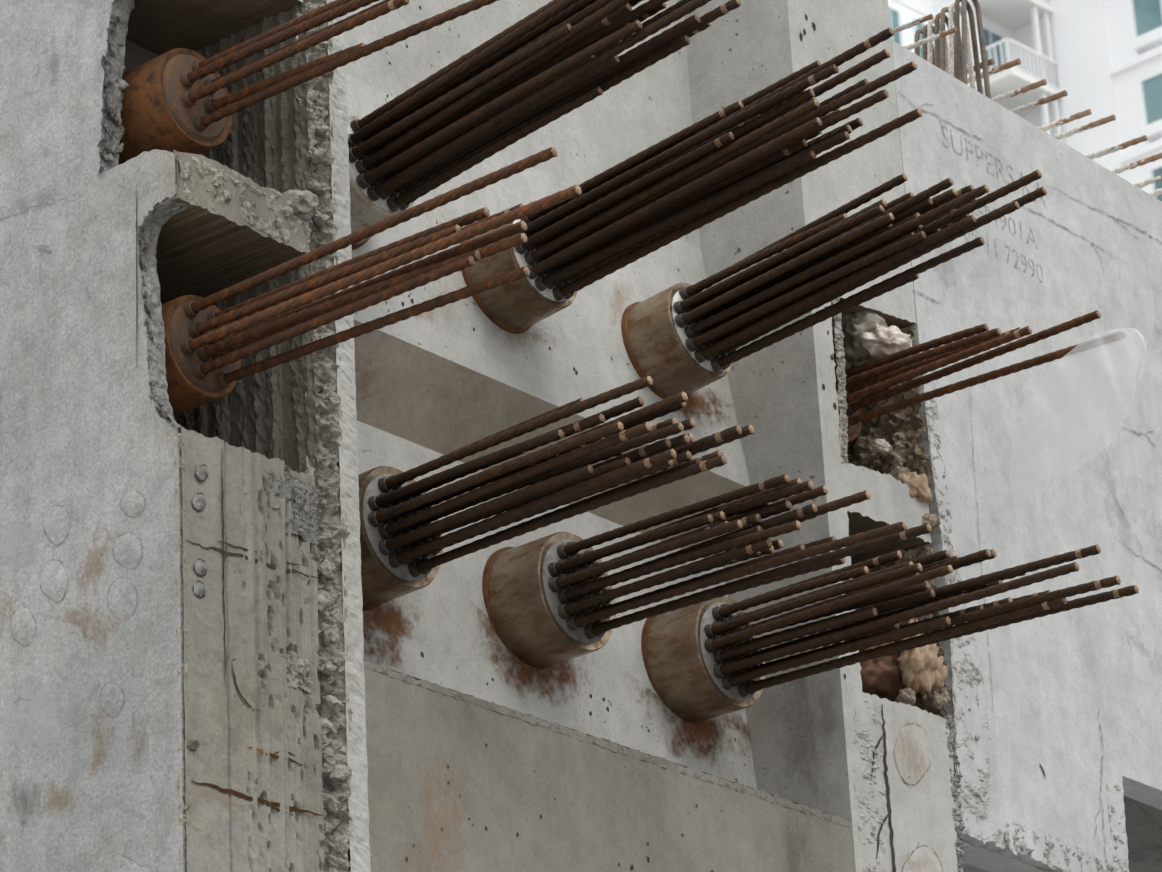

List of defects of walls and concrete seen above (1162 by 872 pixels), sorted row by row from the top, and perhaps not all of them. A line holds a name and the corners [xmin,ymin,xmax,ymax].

spalling [97,0,135,177]
spalling [295,0,335,17]
spalling [294,16,345,67]
spalling [137,65,352,870]
spalling [925,399,961,585]
crack [191,780,323,816]
corrosion [363,600,411,663]
corrosion [486,618,576,696]
spalling [263,298,931,872]
corrosion [663,701,750,756]
crack [872,704,896,872]
spalling [944,604,1128,872]